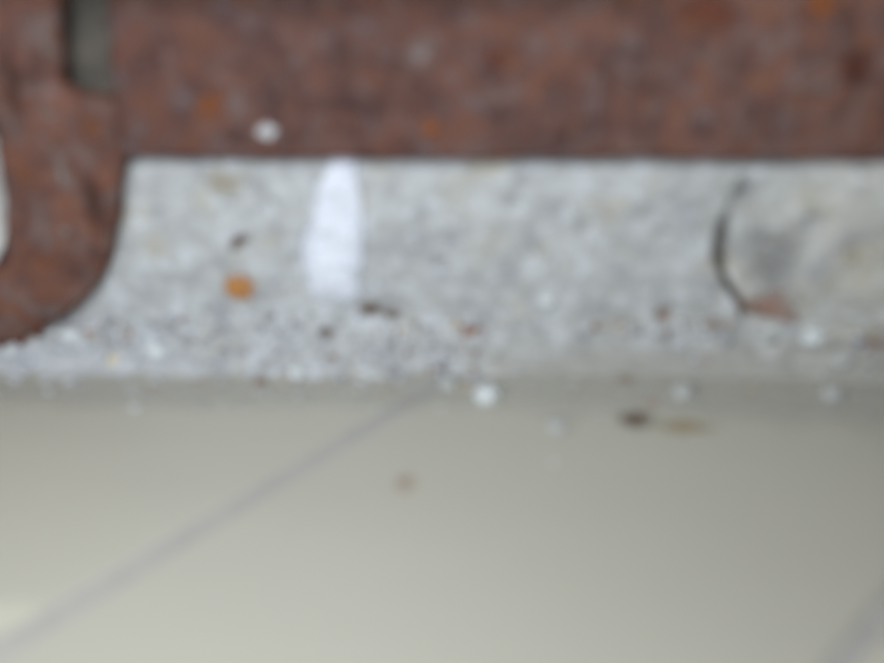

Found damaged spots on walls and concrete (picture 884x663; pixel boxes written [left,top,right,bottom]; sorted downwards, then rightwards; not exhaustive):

corrosion [225,276,252,299]
leakage [301,157,363,301]
corrosion [362,304,396,318]
crack [713,217,768,318]